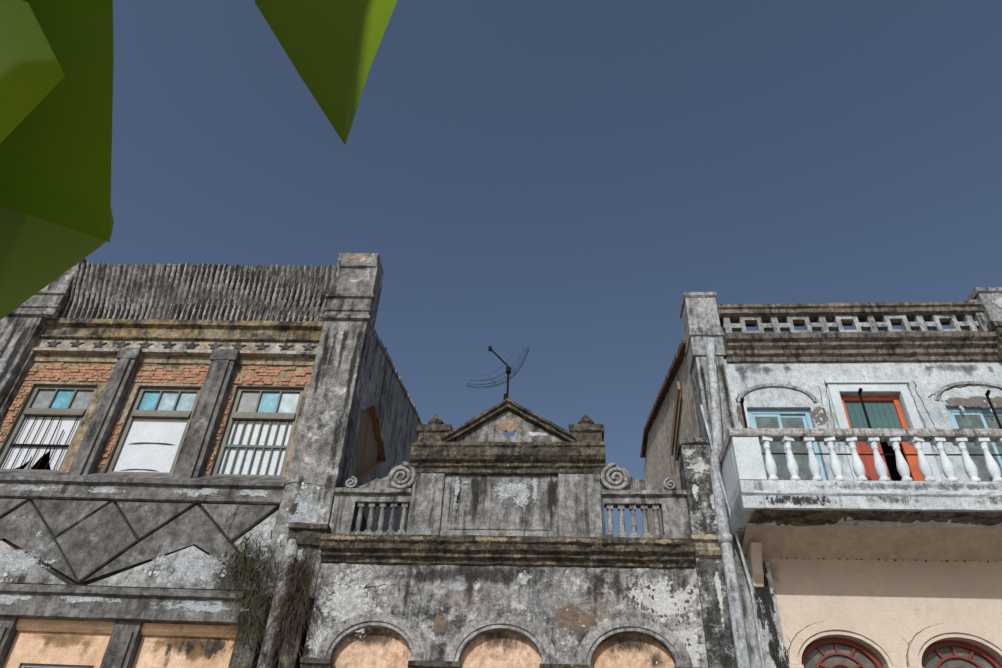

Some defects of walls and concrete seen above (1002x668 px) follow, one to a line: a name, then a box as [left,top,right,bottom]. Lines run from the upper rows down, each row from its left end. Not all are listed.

leakage [0,327,30,384]
leakage [314,334,329,392]
leakage [334,330,361,453]
leakage [761,483,1002,506]
leakage [391,565,553,598]
leakage [752,561,789,668]
leakage [155,636,225,665]
leakage [357,629,396,645]
leakage [487,632,524,648]
leakage [611,635,653,651]